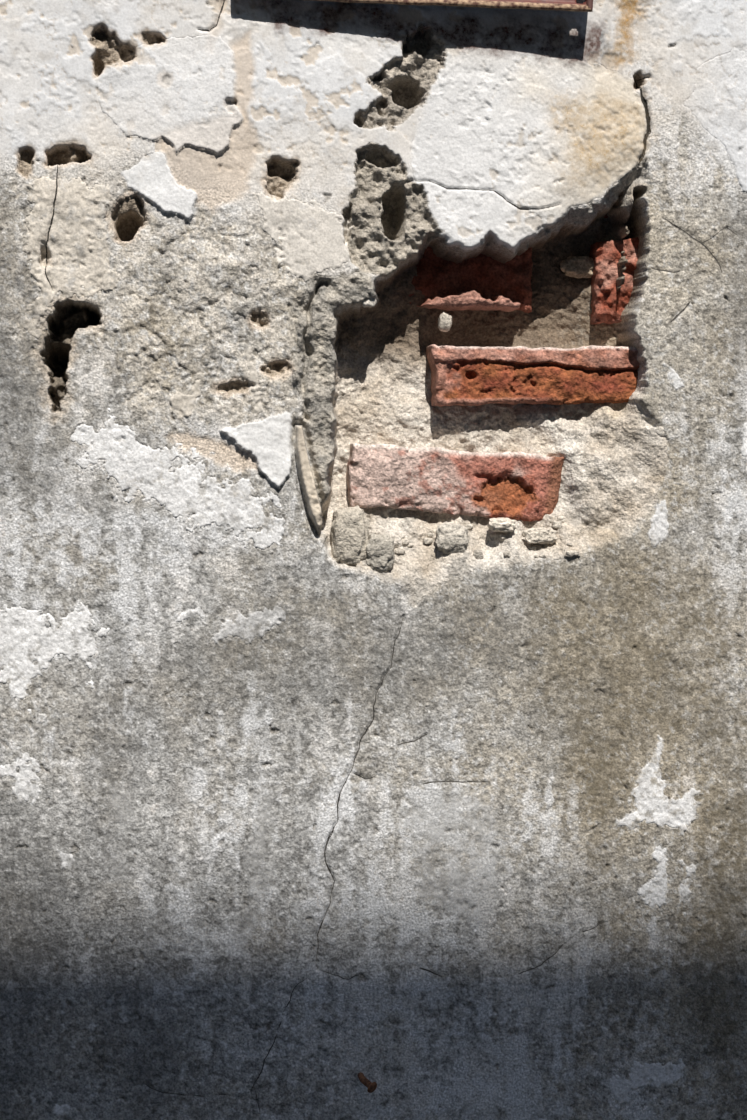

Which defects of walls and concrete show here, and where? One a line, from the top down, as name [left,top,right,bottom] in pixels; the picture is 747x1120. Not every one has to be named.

peeling [94,34,243,221]
crack [45,165,58,287]
peeling [18,176,120,341]
spalling [70,160,669,605]
crack [85,619,444,1112]
crack [476,922,603,980]
peeling [615,735,704,836]
peeling [637,844,697,916]